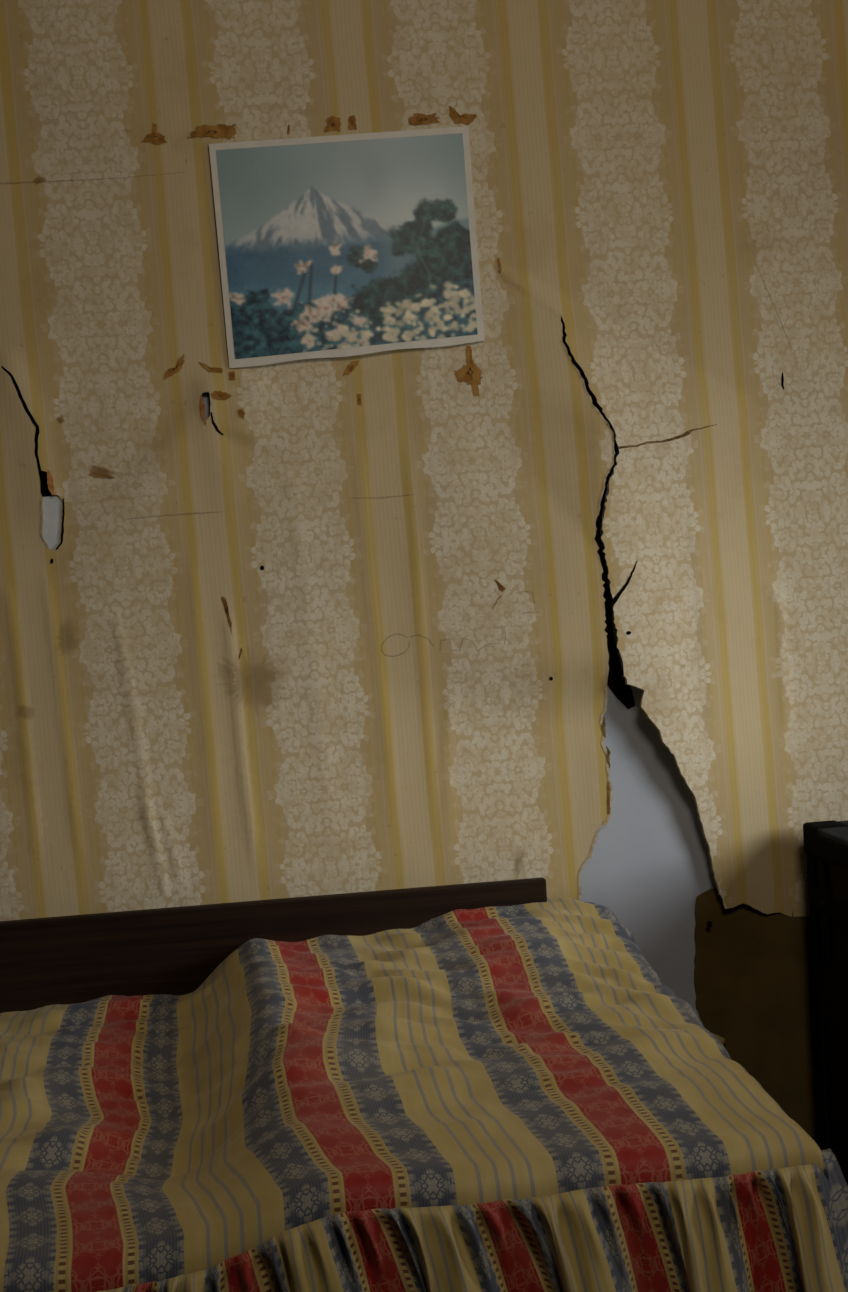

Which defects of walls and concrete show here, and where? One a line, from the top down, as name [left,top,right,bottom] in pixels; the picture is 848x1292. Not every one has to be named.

crack [1,366,40,466]
crack [561,317,717,709]
peeling [602,717,611,814]